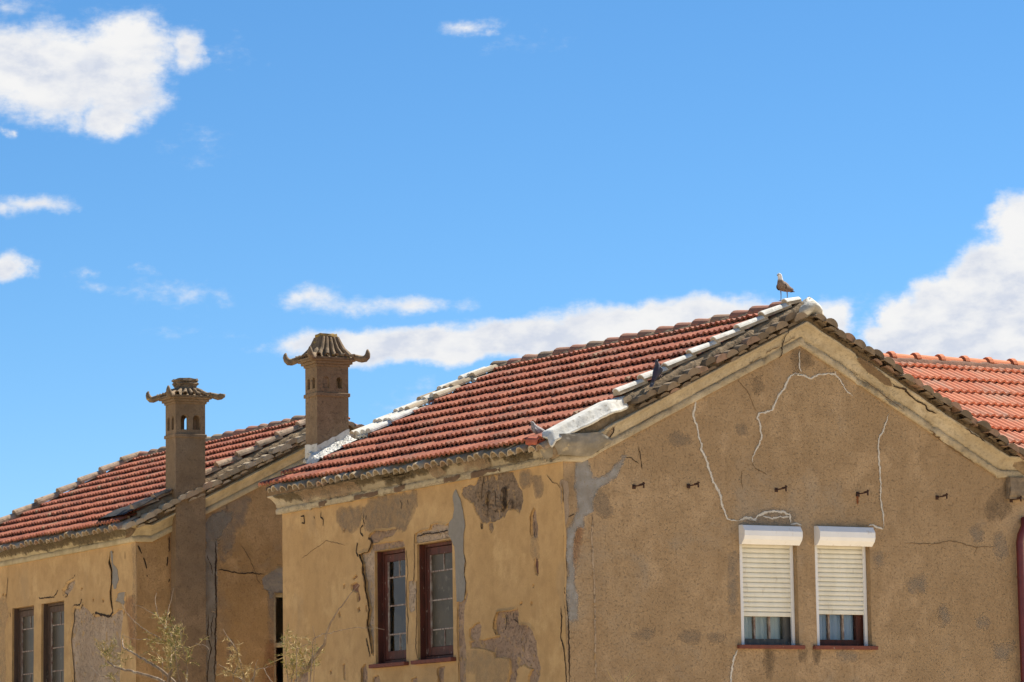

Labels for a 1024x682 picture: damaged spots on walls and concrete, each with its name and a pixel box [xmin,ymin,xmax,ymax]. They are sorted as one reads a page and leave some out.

crack [692,330,985,529]
peeling [279,459,546,538]
spalling [39,575,126,682]
crack [92,552,113,618]
crack [207,539,265,681]
spalling [456,593,541,682]
crack [909,541,989,552]